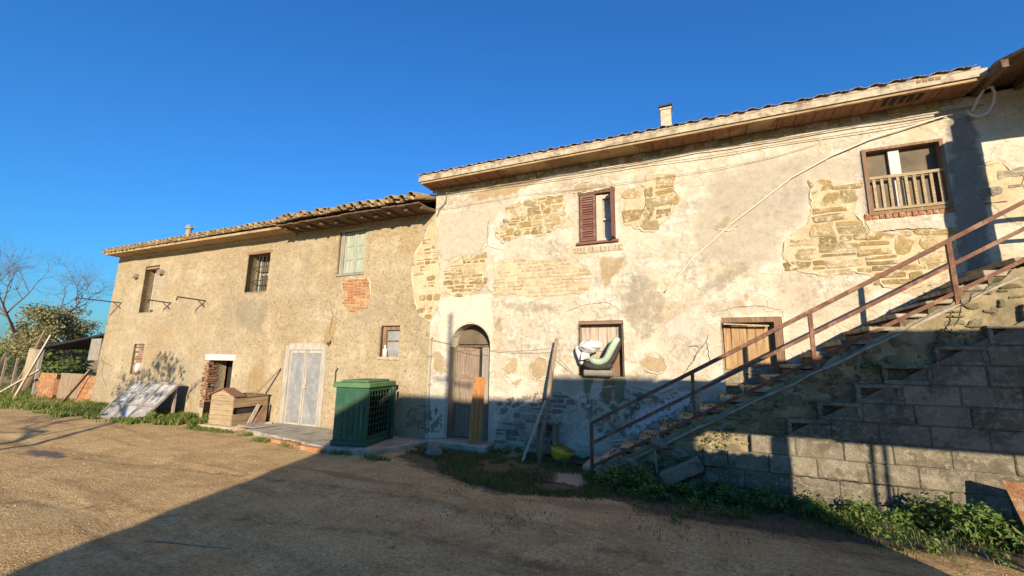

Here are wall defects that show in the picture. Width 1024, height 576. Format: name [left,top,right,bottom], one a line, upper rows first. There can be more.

peeling [422,170,610,244]
peeling [621,173,680,233]
peeling [782,179,959,293]
peeling [976,160,1024,224]
flaking render [341,277,372,312]
flaking render [411,222,593,373]
peeling [640,350,668,375]
peeling [494,356,699,448]